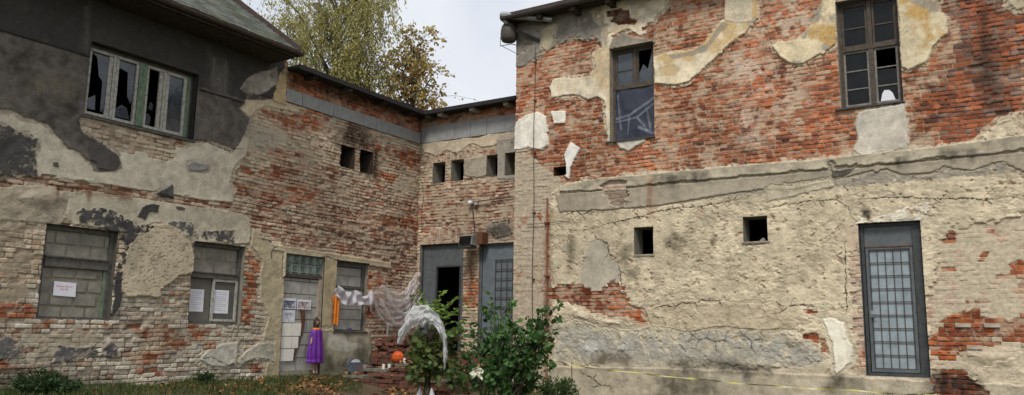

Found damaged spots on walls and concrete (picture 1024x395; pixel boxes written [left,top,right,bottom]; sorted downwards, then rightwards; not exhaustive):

flaking render [653,0,758,85]
flaking render [516,0,665,141]
spalling [77,113,198,162]
spalling [942,231,956,244]
spalling [996,260,1024,293]
flaking render [0,303,58,333]
flaking render [121,324,275,376]
spalling [548,280,669,325]
crack [655,299,815,350]
spalling [928,308,1024,395]